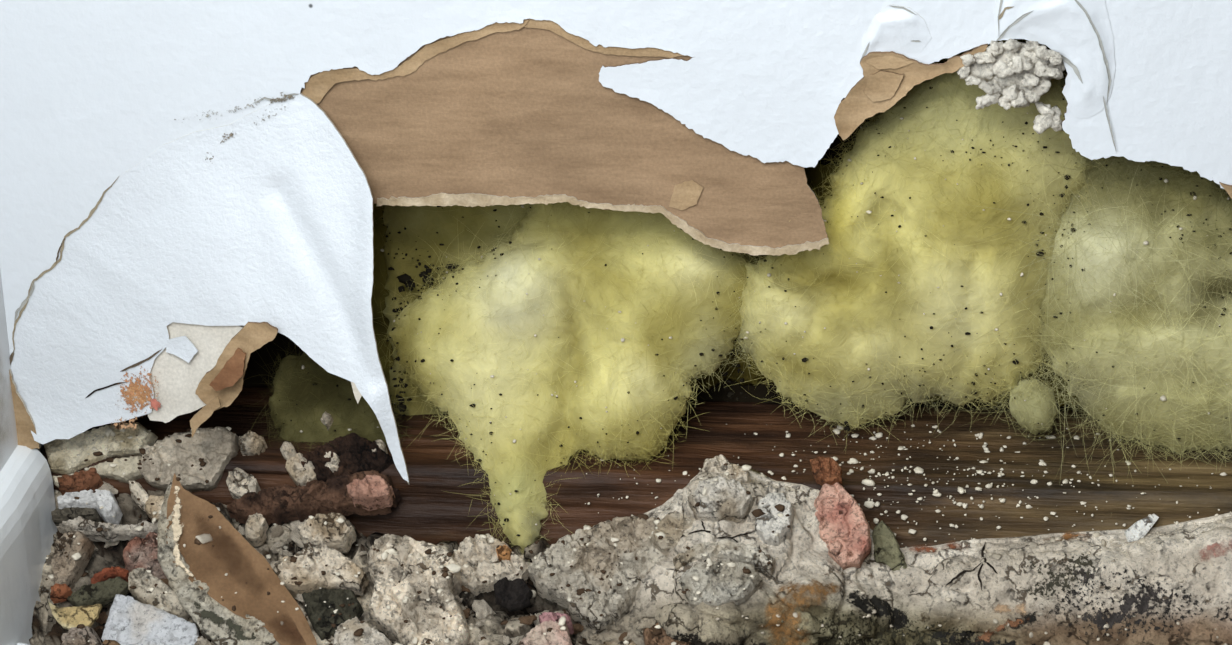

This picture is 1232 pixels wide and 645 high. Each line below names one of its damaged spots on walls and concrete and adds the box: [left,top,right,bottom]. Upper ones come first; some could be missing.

spalling [957,39,1066,134]
spalling [818,117,871,167]
peeling [9,18,829,484]
leakage [388,243,459,416]
spalling [904,398,1010,409]
flaking render [129,481,164,522]
leakage [810,456,907,571]
crack [945,542,998,590]
peeling [1124,514,1159,543]
leakage [1201,543,1232,559]
leakage [789,553,1232,645]
leakage [643,622,766,645]